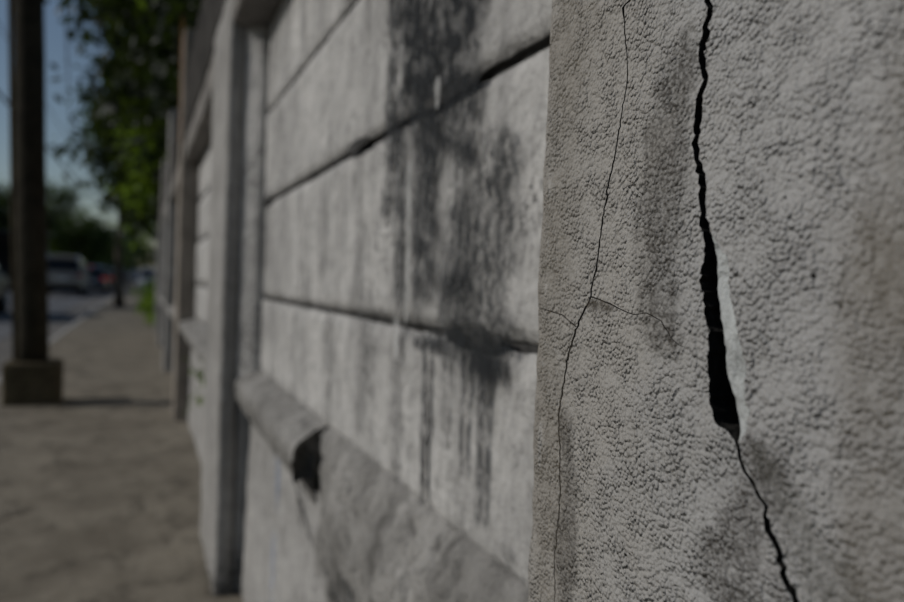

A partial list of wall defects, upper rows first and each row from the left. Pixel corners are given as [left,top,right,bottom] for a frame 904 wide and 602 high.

leakage [381,0,503,521]
crack [540,0,683,602]
crack [691,0,800,602]